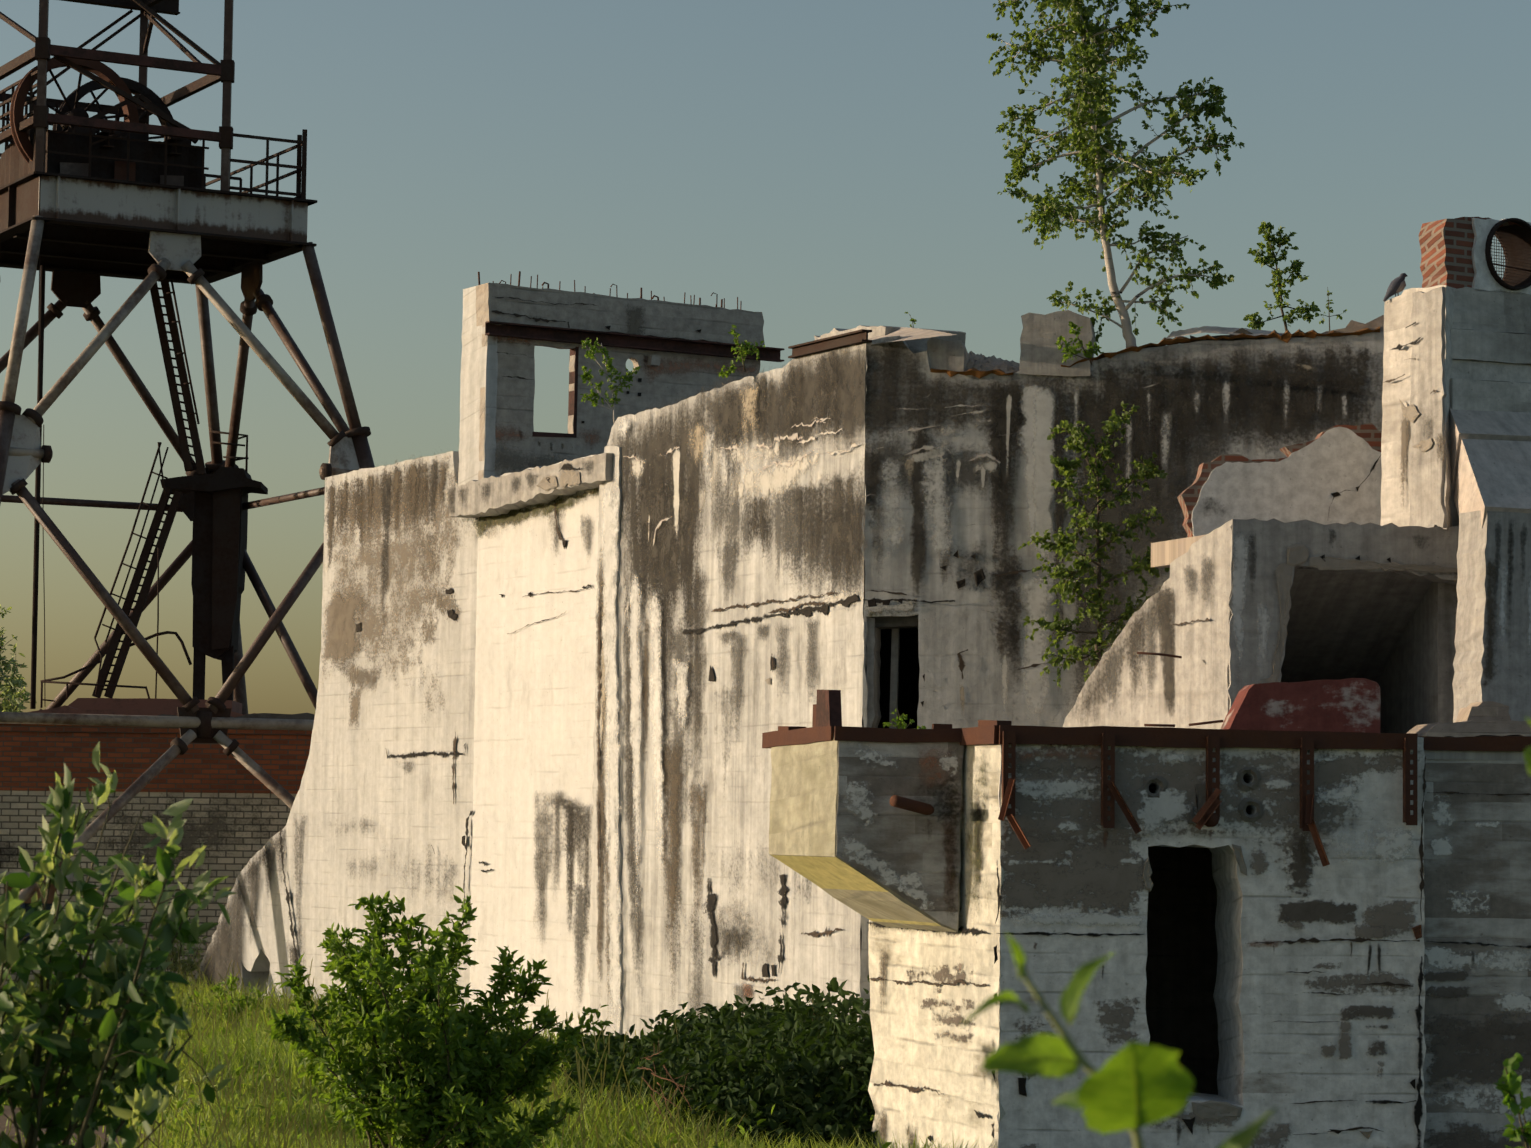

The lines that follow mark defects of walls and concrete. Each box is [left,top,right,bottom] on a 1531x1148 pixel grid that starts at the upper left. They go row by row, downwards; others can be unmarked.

damp [512,474,538,490]
damp [476,520,490,537]
damp [323,461,464,725]
crack [682,569,1042,643]
damp [534,340,1369,1018]
crack [386,732,493,926]
damp [878,1113,887,1146]